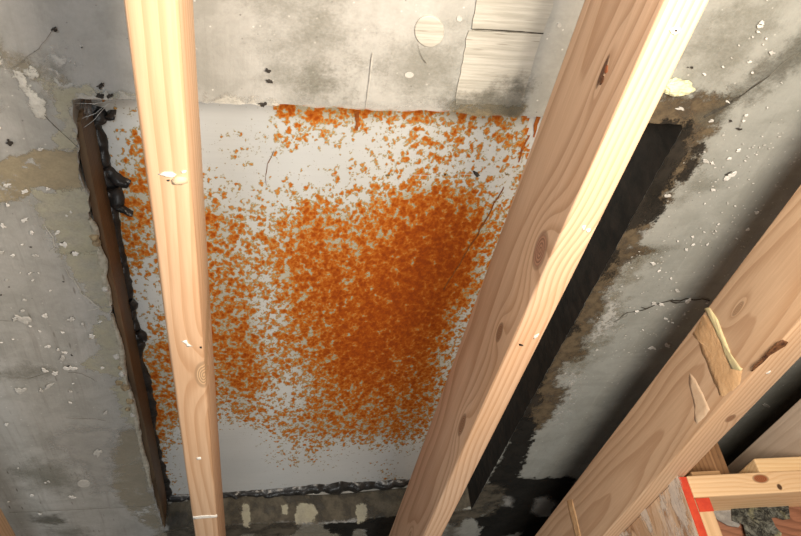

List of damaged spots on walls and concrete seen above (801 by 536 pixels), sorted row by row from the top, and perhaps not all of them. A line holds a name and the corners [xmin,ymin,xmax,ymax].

corrosion [107,121,185,495]
corrosion [203,104,540,480]
crack [615,298,710,322]
leakage [286,516,396,536]